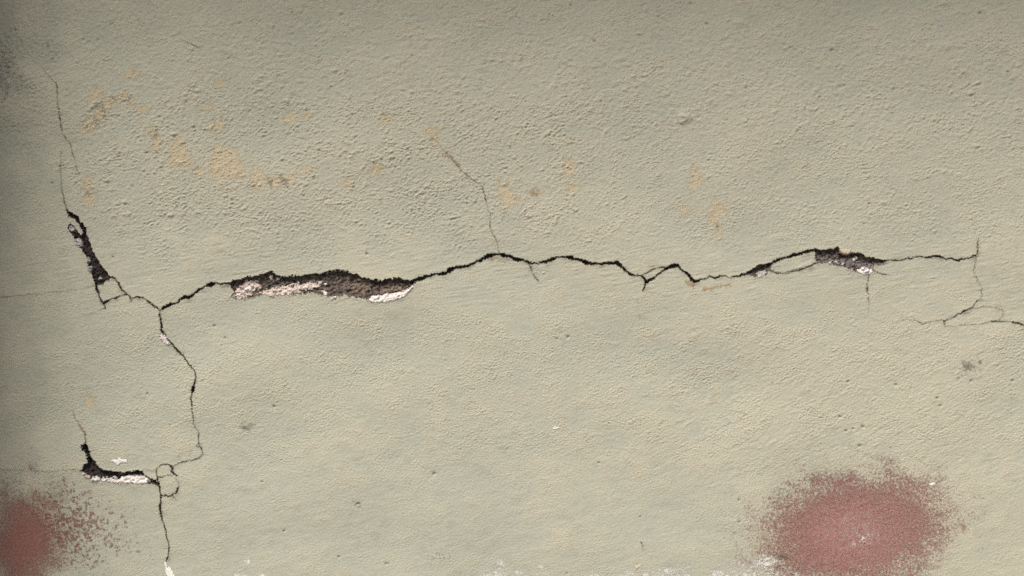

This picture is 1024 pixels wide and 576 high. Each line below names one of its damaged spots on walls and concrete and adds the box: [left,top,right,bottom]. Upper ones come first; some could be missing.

flaking render [67,212,111,285]
flaking render [228,269,416,303]
crack [412,225,744,291]
flaking render [743,263,772,277]
crack [770,248,818,274]
flaking render [814,247,886,276]
crack [866,239,979,292]
crack [919,290,1024,326]
crack [95,276,228,562]
flaking render [80,444,160,486]